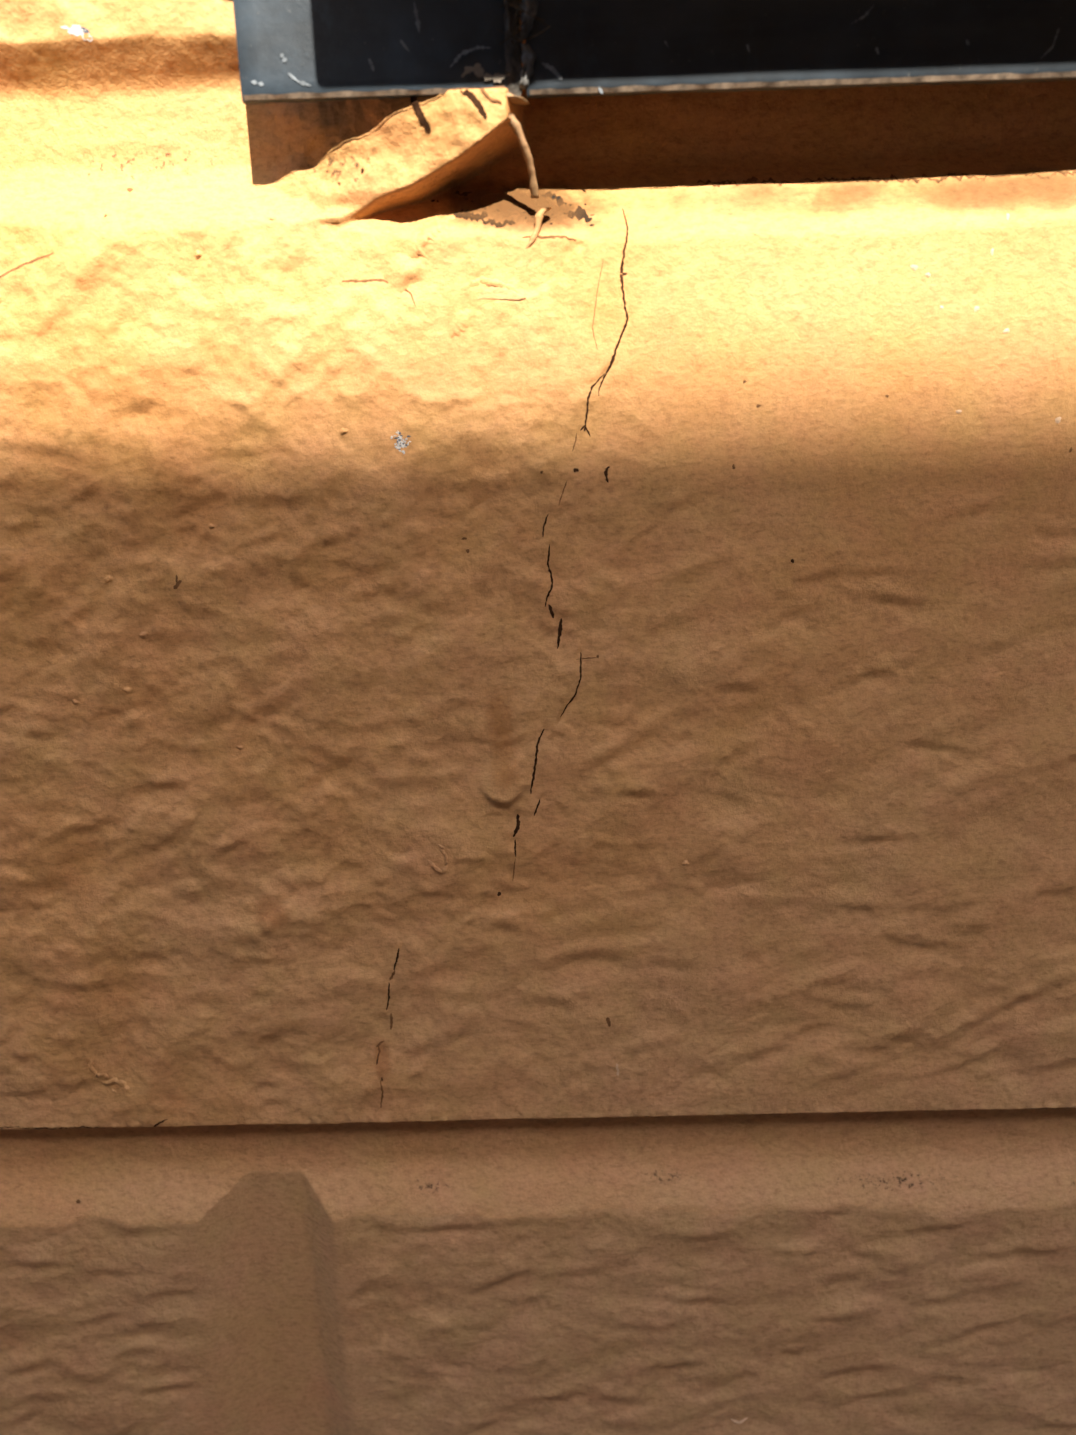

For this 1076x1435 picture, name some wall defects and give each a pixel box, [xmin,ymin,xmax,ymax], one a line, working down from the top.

peeling [404,210,457,259]
peeling [448,276,525,338]
crack [511,208,629,881]
crack [374,948,399,1107]